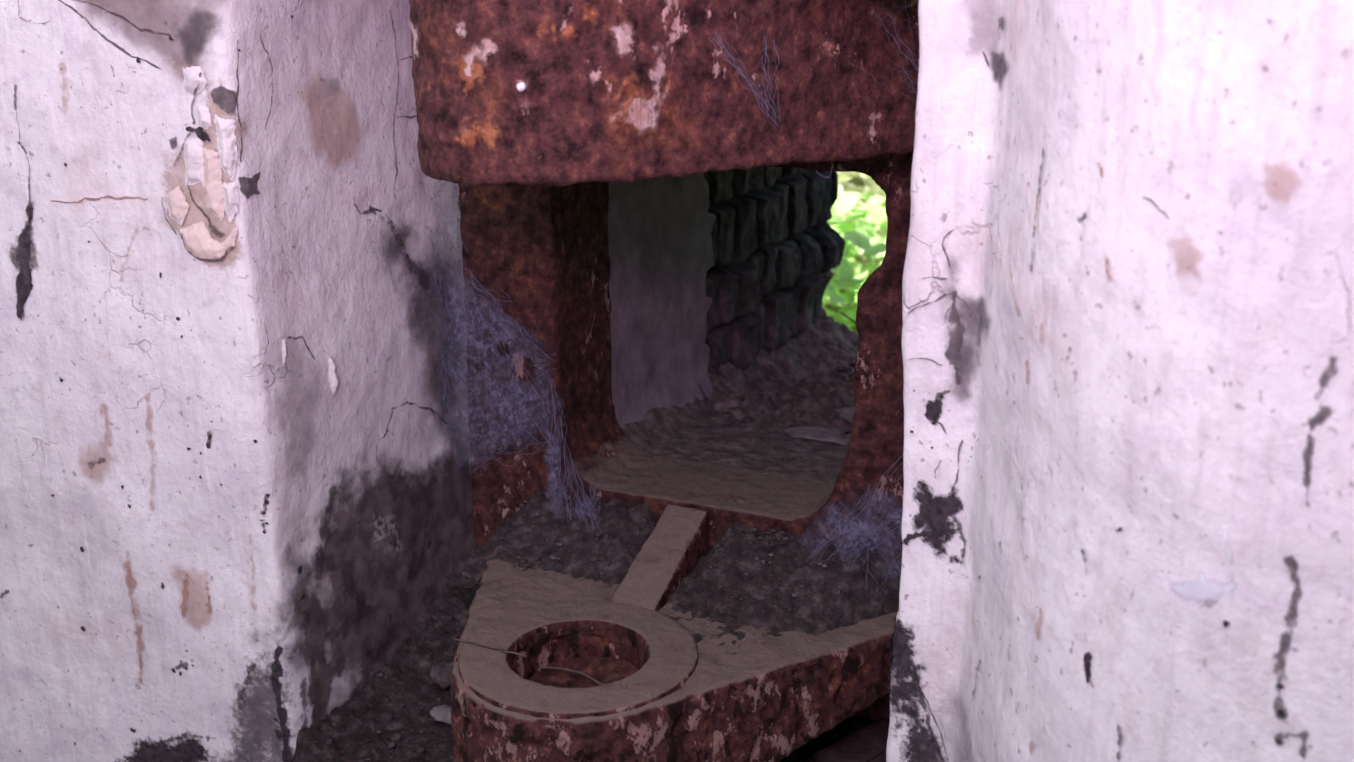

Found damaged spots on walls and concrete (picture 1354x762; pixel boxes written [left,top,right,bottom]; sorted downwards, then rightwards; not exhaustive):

crack [18,0,169,69]
rust [538,5,597,37]
peeling [162,59,261,267]
rust [443,51,484,90]
rust [454,121,499,147]
rust [609,75,657,128]
leakage [909,230,987,401]
rust [125,563,143,683]
leakage [115,448,475,762]